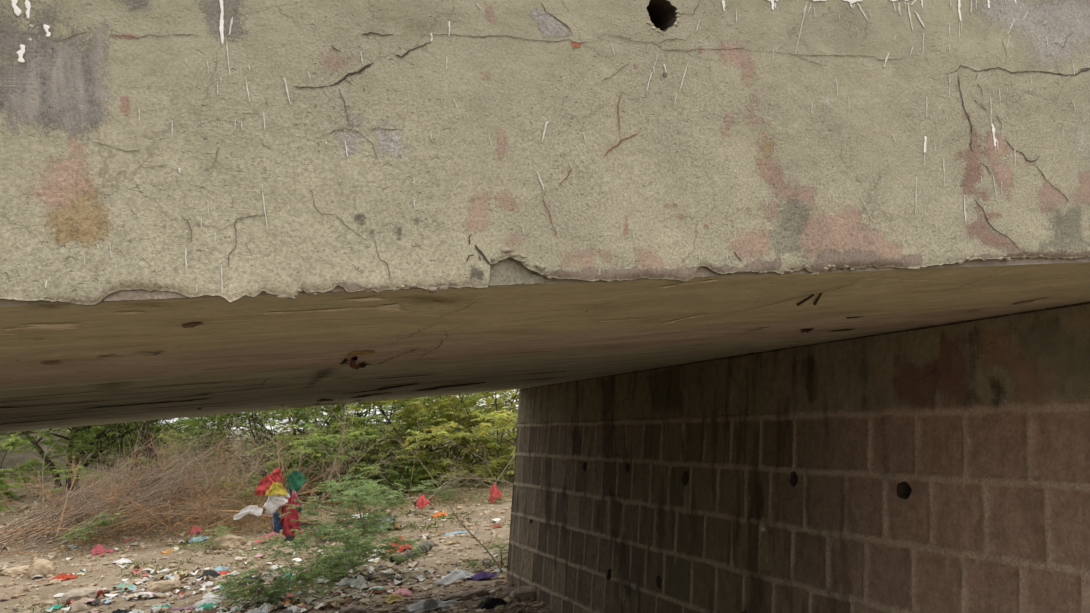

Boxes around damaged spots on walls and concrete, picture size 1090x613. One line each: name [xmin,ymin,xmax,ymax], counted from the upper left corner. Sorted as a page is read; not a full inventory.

crack [293,0,907,160]
crack [947,33,1090,201]
crack [310,189,390,278]
peeling [331,281,457,293]
crack [466,234,491,266]
crack [542,170,572,238]
peeling [470,248,924,286]
crack [975,199,1021,251]
crack [0,306,469,424]